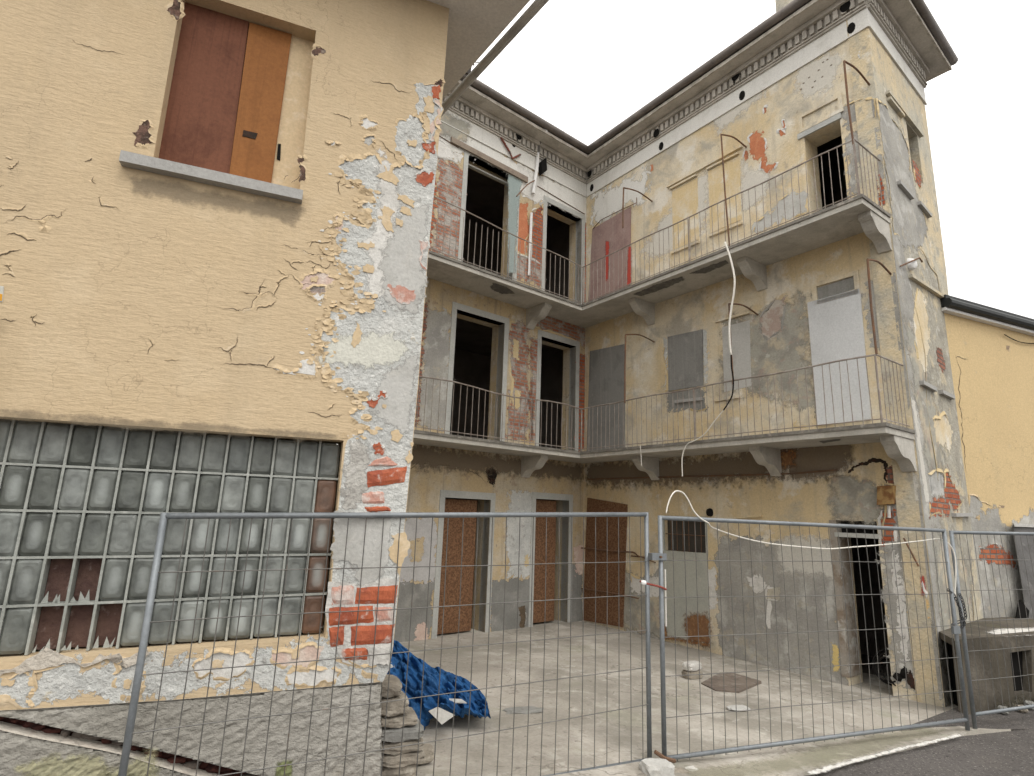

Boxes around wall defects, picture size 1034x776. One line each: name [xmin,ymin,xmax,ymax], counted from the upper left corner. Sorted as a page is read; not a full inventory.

crack [1,314,43,327]
crack [0,156,67,277]
crack [85,158,120,210]
crack [216,178,364,368]
flaking render [742,119,786,173]
flaking render [0,79,467,710]
flaking render [505,316,585,451]
flaking render [841,96,1019,707]
crack [848,458,888,485]
flaking render [832,644,840,672]